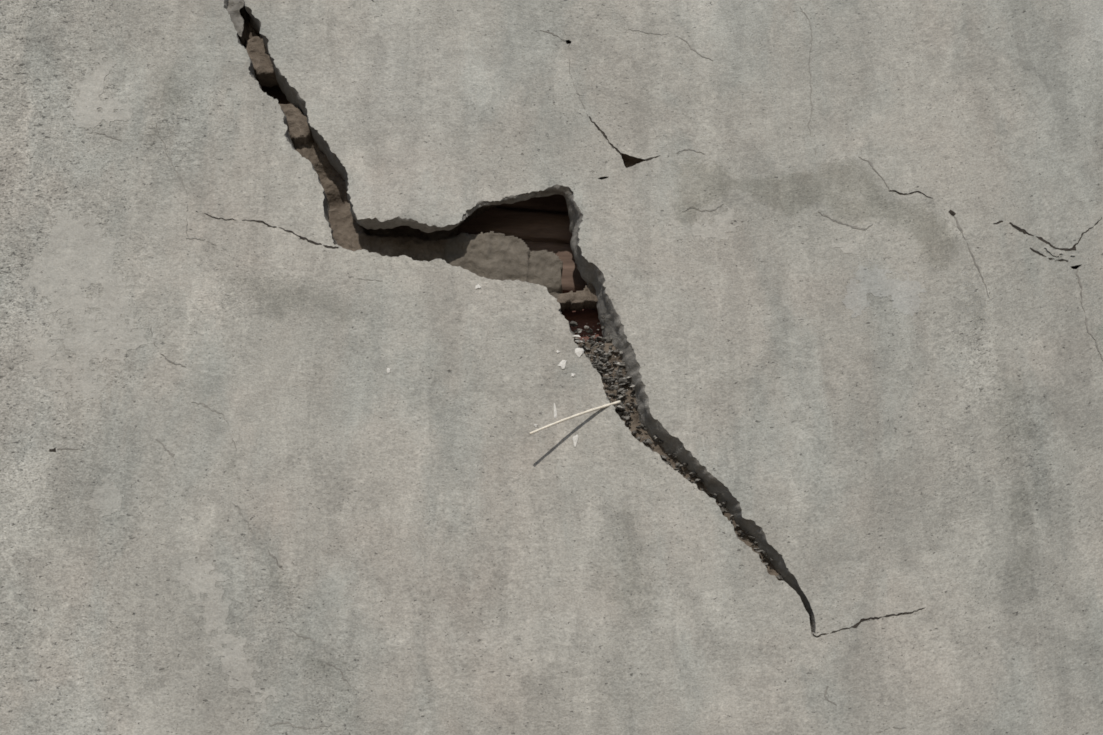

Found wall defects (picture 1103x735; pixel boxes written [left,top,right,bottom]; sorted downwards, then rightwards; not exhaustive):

crack [156,0,924,637]
crack [860,157,988,295]
crack [993,217,1103,360]